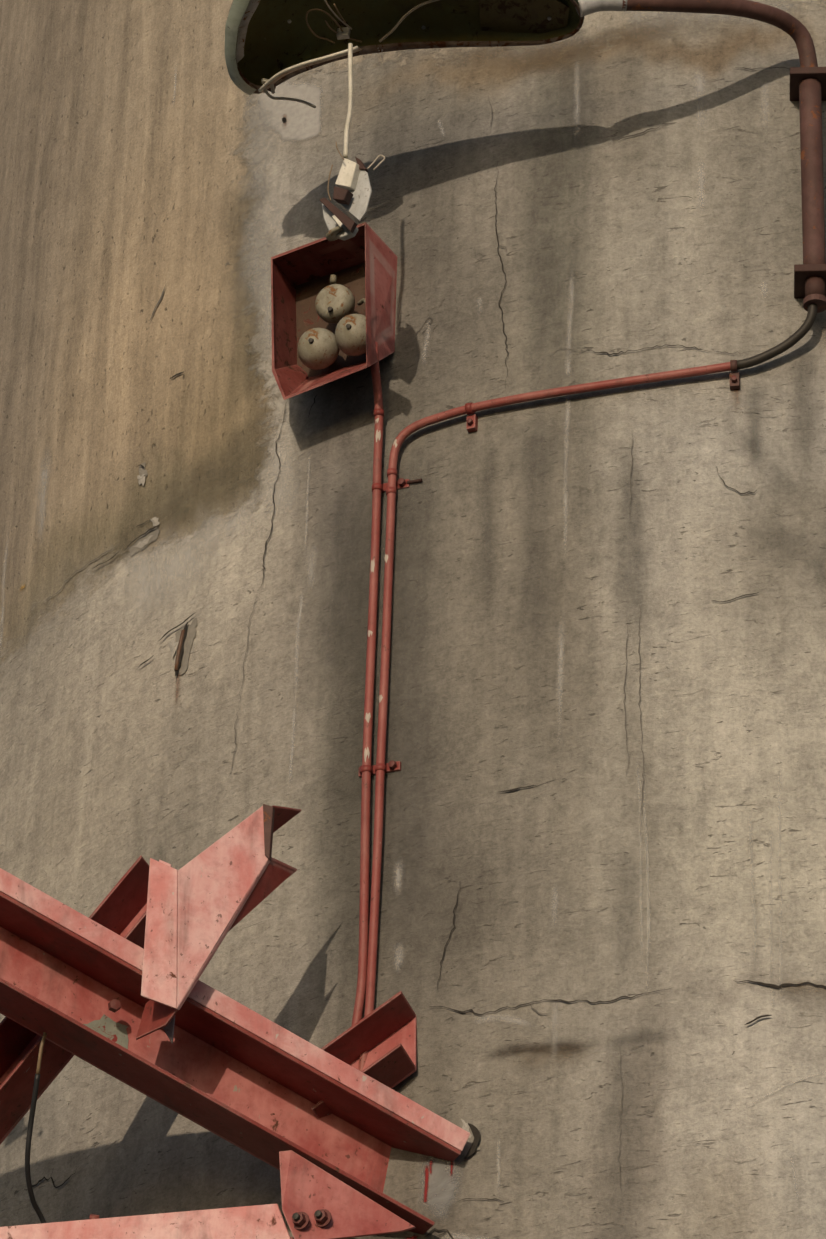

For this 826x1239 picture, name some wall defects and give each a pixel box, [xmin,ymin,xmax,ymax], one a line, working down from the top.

crack [488,162,509,388]
spalling [160,612,197,676]
crack [230,395,317,773]
crack [429,888,668,1015]
crack [425,1198,504,1239]